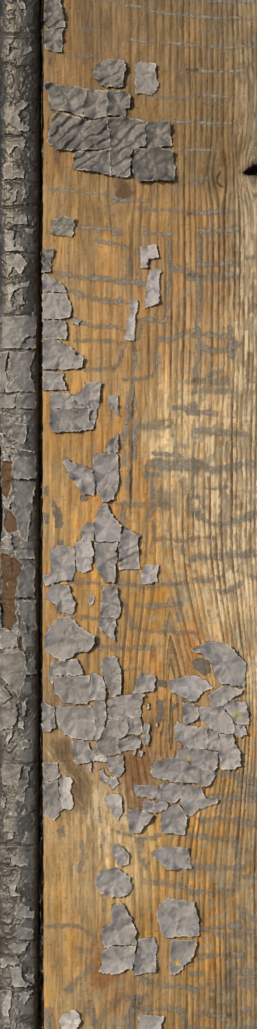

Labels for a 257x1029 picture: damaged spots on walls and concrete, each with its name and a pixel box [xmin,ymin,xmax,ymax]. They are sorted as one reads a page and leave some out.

peeling [43,0,65,53]
peeling [3,100,29,204]
peeling [44,59,176,184]
peeling [0,213,121,433]
peeling [124,244,162,341]
peeling [0,423,250,870]
peeling [0,855,35,1029]
peeling [94,843,200,975]
peeling [59,1010,81,1029]
peeling [138,1013,164,1029]